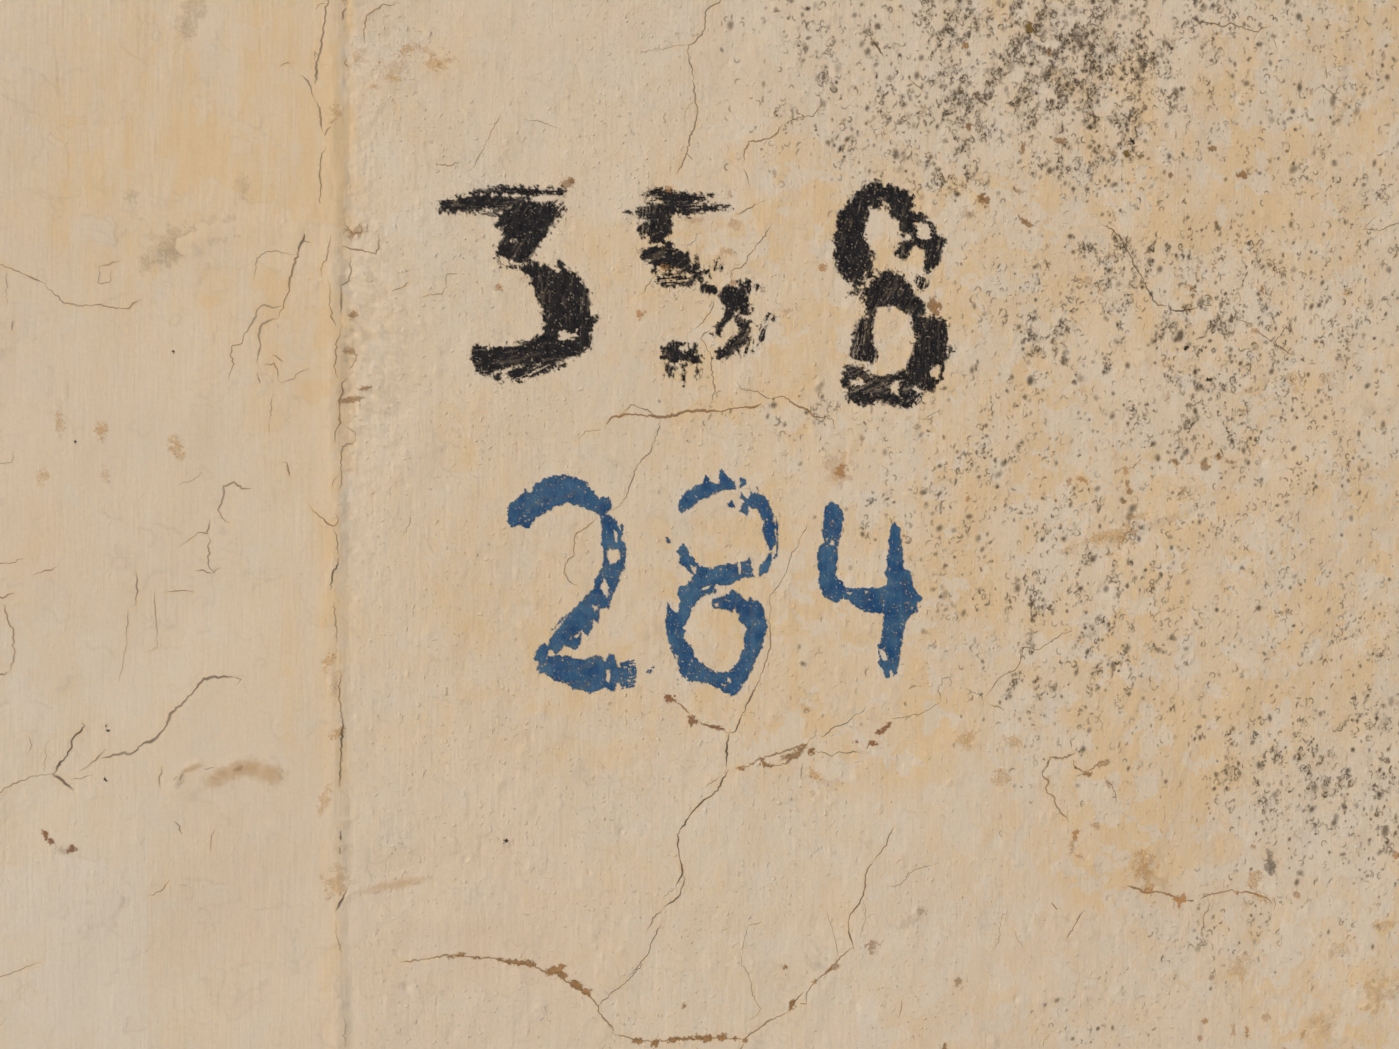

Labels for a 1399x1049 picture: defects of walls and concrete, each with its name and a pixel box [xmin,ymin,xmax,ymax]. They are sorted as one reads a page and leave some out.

crack [646,0,721,171]
leakage [815,0,1236,201]
crack [730,109,818,273]
leakage [1006,263,1078,416]
leakage [1069,209,1338,464]
crack [564,302,834,582]
crack [120,477,246,674]
leakage [999,552,1163,712]
crack [0,676,240,793]
crack [404,529,927,1049]
leakage [1208,698,1353,835]
leakage [1370,748,1396,862]